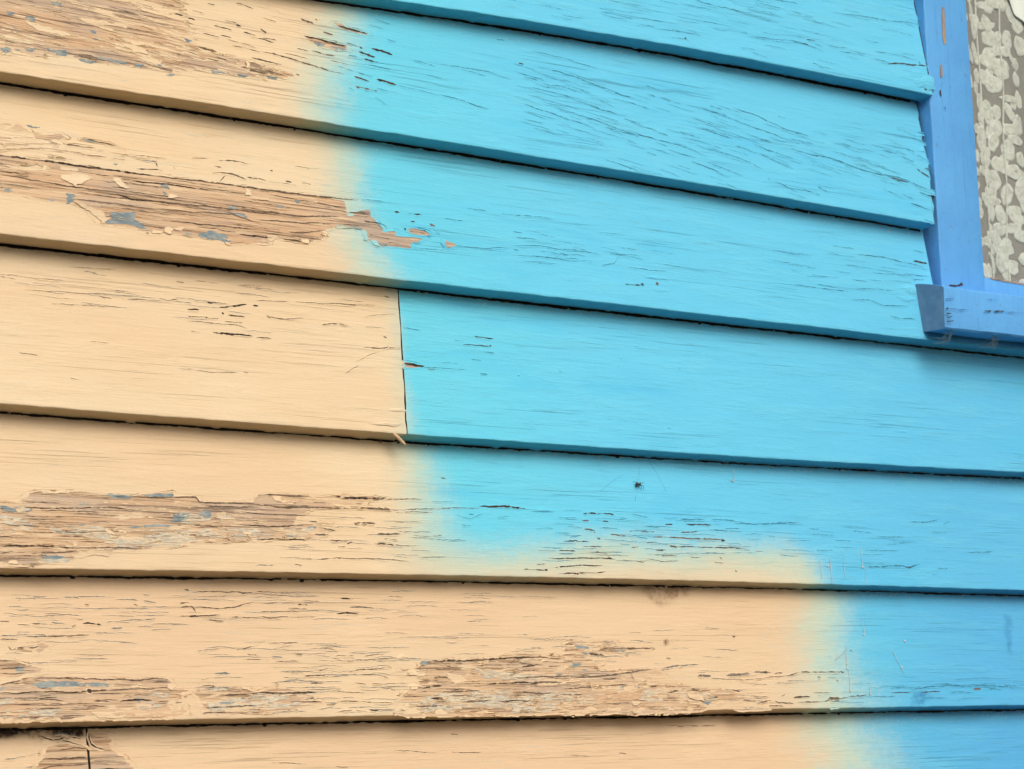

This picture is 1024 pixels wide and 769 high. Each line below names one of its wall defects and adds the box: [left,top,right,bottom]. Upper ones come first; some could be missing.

peeling [0,0,298,81]
peeling [0,122,461,250]
peeling [0,488,396,567]
peeling [0,637,885,769]